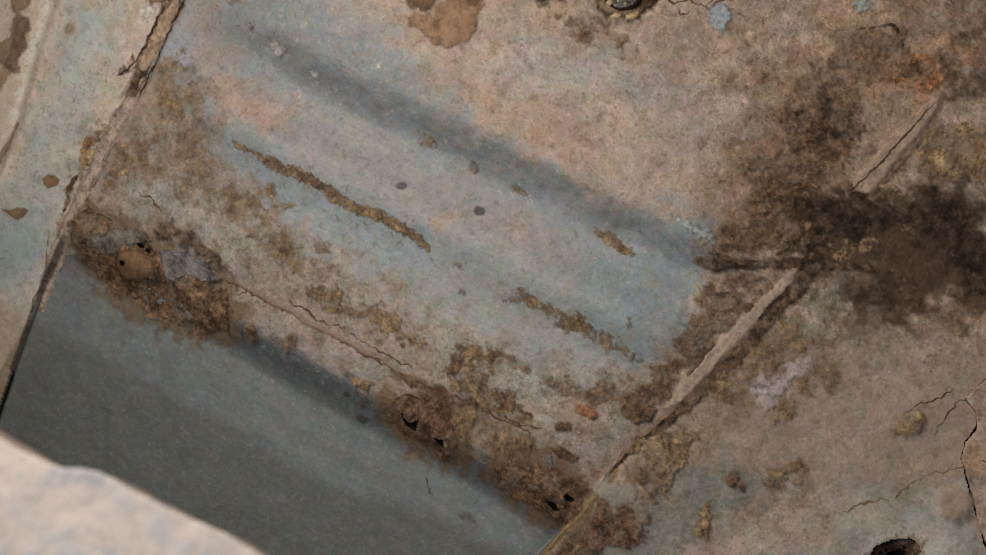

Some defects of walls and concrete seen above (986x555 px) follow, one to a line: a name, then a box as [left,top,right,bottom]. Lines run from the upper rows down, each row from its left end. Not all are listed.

rust [916,122,986,182]
rust [153,218,227,271]
rust [223,183,302,273]
rust [306,266,427,348]
rust [544,58,878,504]
damp [782,175,986,324]
crack [225,279,540,455]
rust [390,344,532,472]
crack [908,391,956,422]
rust [547,501,649,555]
crack [844,484,909,513]
rust [871,539,921,555]